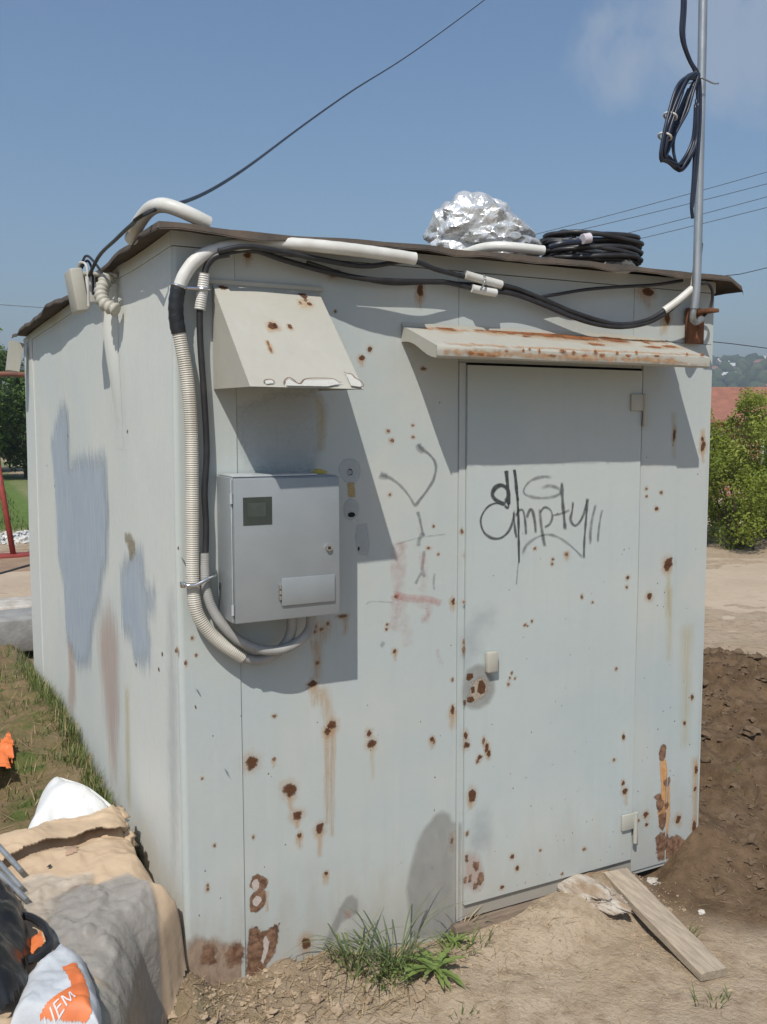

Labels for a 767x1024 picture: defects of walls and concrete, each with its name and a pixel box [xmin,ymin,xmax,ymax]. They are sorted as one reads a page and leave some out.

rust [422,327,704,363]
peeling [263,372,364,387]
rust [451,673,486,714]
rust [464,732,494,767]
rust [282,784,297,797]
rust [638,744,699,860]
rust [250,866,268,913]
rust [463,855,484,890]
rust [186,923,280,986]